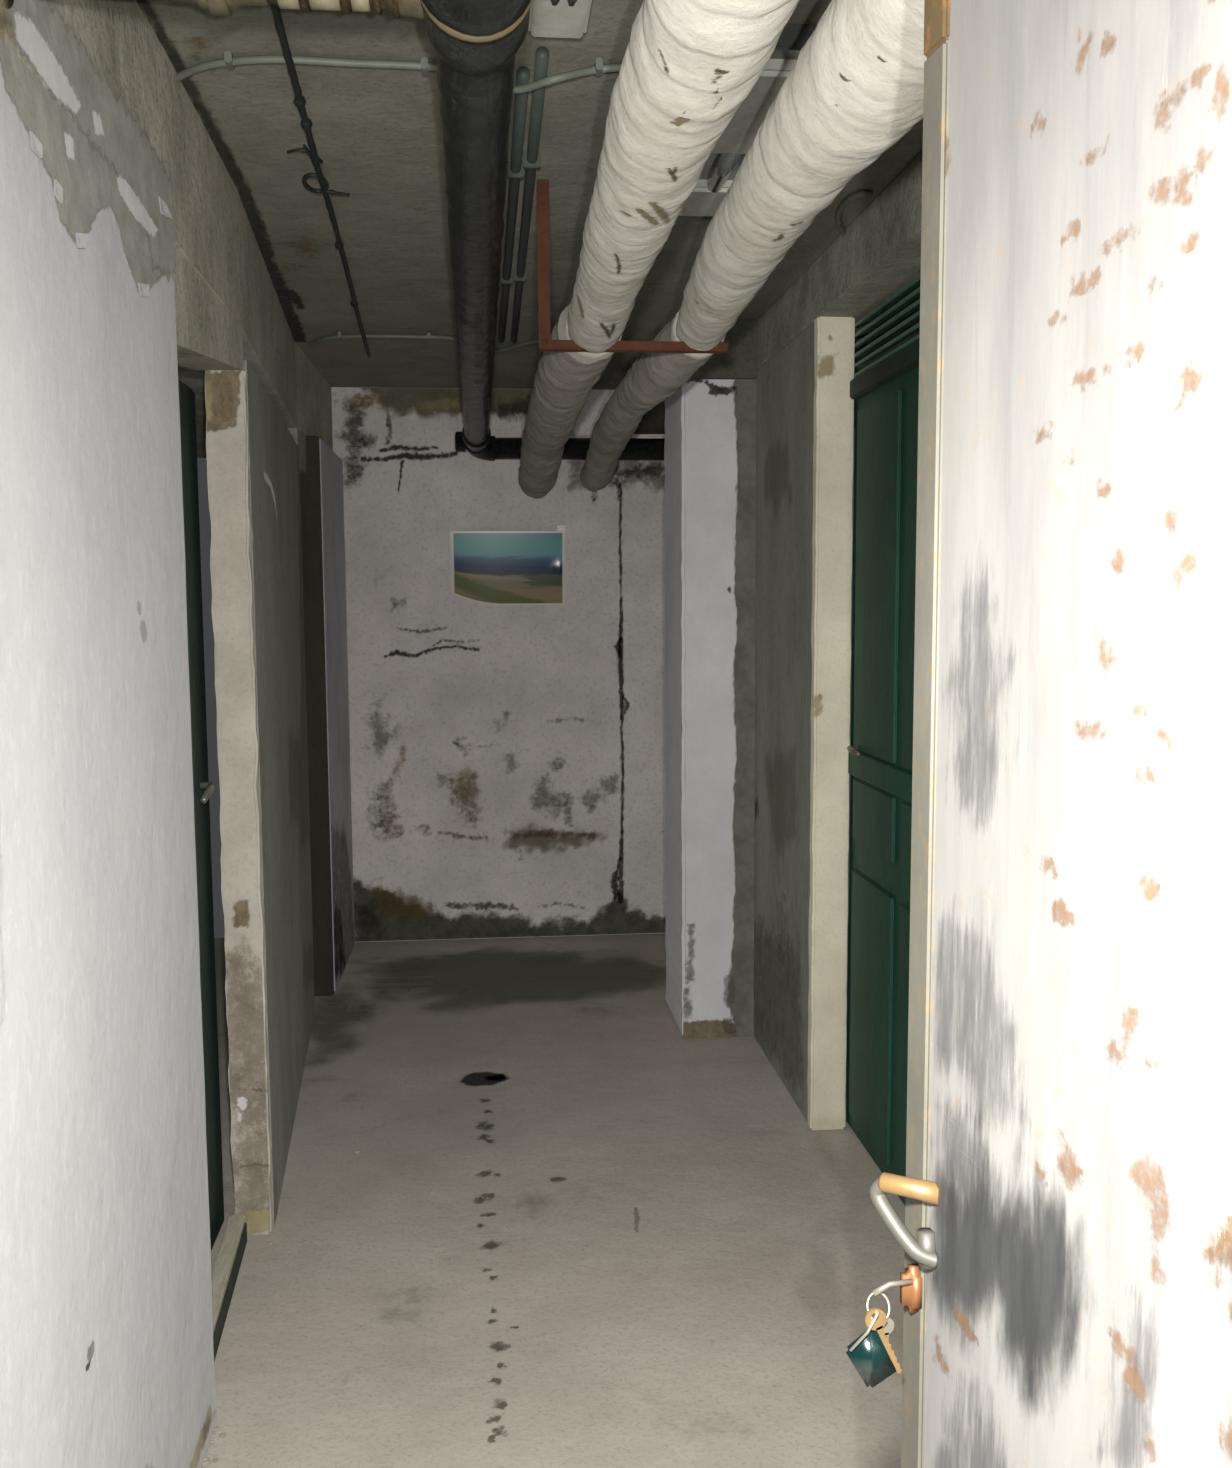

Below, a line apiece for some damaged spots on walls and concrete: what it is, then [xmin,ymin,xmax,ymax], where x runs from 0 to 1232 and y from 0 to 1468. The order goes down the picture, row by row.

rust [1192,67,1228,96]
peeling [0,0,176,297]
rust [1158,149,1210,203]
crack [361,445,458,491]
crack [384,627,479,658]
crack [611,483,629,903]
damp [440,773,487,839]
damp [386,954,660,1006]
rust [1197,1208,1232,1285]